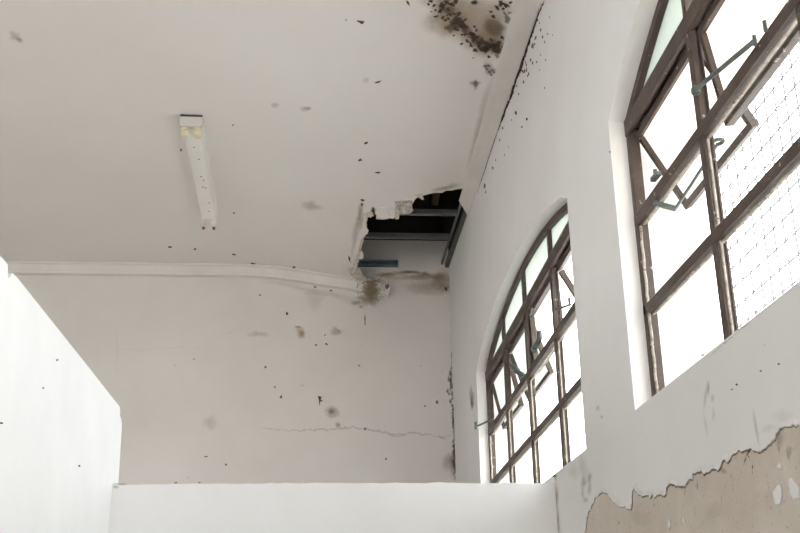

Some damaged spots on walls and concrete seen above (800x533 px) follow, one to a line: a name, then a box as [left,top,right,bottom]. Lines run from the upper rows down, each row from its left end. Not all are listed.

damp [427,0,504,75]
crack [478,2,553,193]
crack [446,351,456,476]
peeling [585,418,800,533]